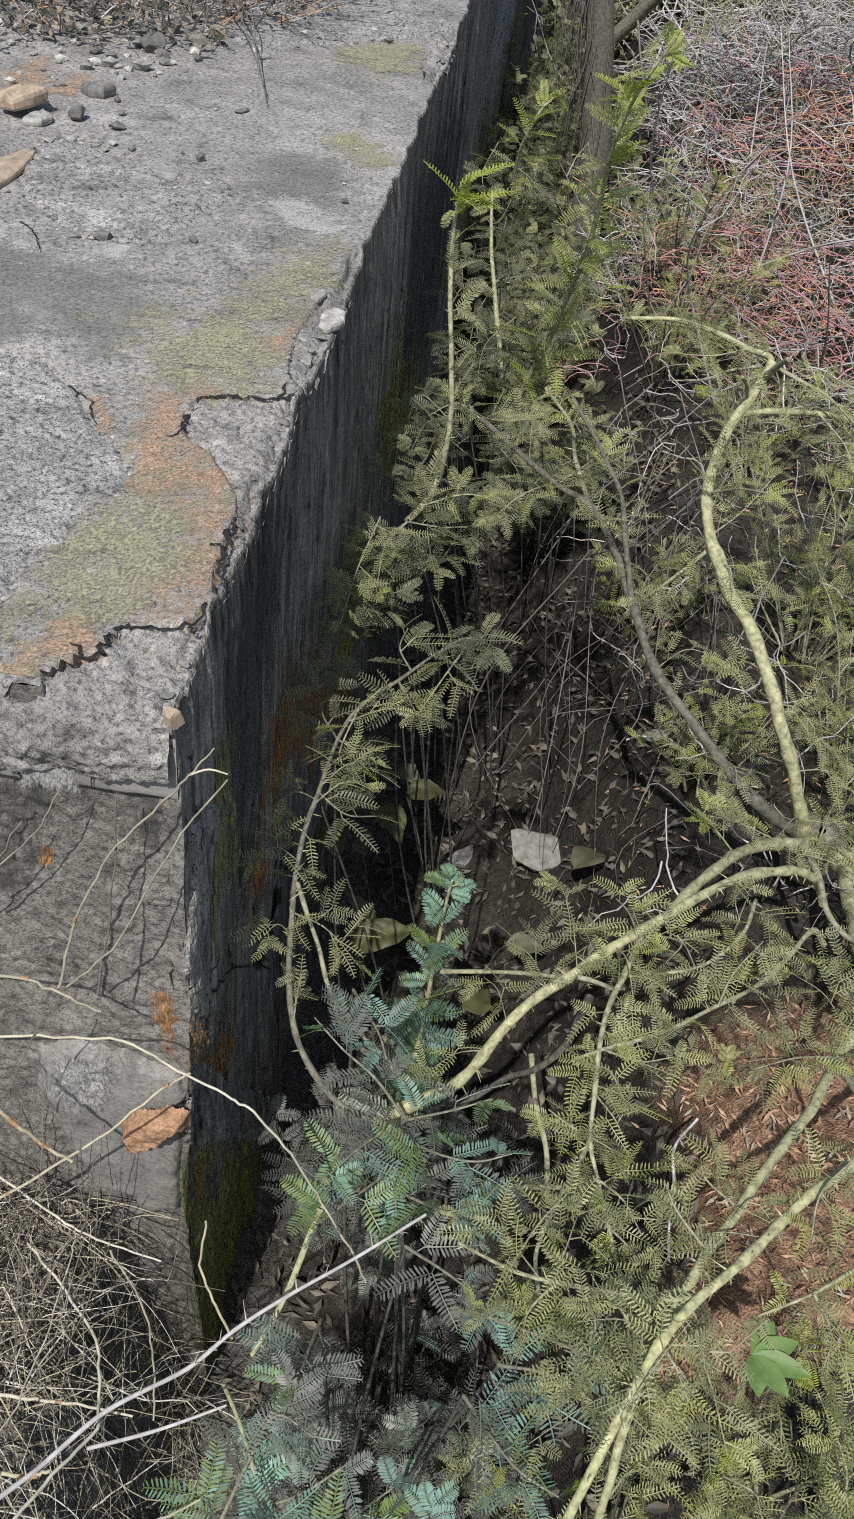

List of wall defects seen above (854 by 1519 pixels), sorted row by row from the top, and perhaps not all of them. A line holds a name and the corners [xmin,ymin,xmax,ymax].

spalling [183,262,353,627]
spalling [0,628,205,784]
rust [246,632,355,936]
rust [152,991,235,1078]